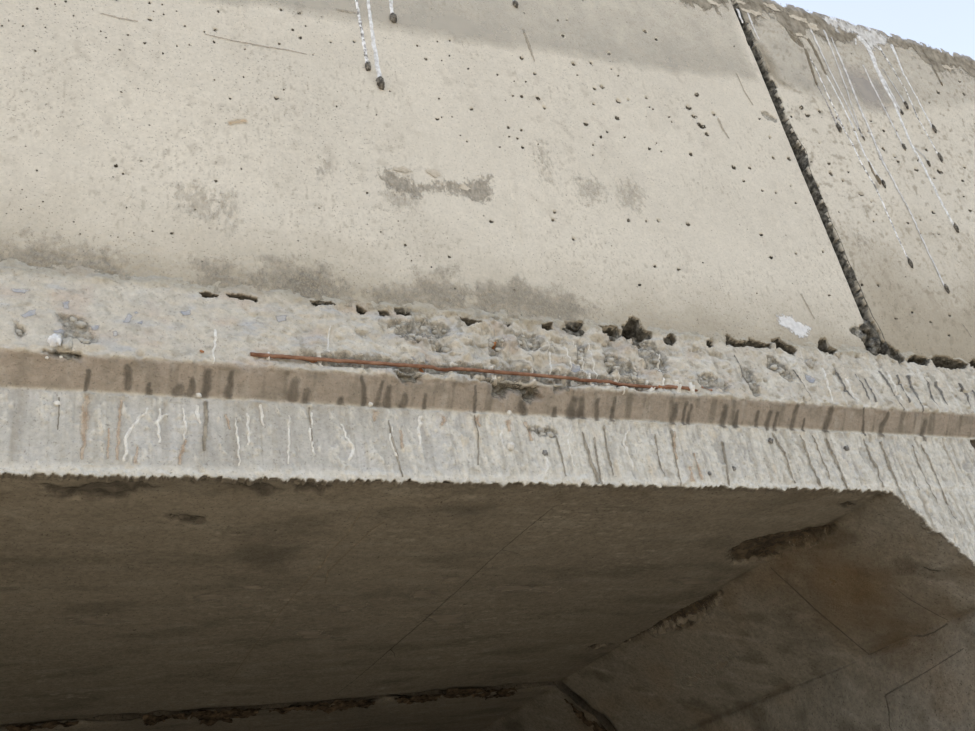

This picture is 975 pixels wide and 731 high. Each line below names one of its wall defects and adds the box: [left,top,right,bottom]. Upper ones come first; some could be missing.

damp [355,0,385,90]
crack [730,0,893,359]
damp [785,16,959,294]
damp [360,376,407,408]
spalling [250,310,729,404]
spalling [726,336,816,383]
spalling [818,339,835,355]
spalling [849,325,975,370]
damp [754,411,796,483]
damp [790,368,910,509]
damp [878,371,954,517]
spalling [729,524,836,560]